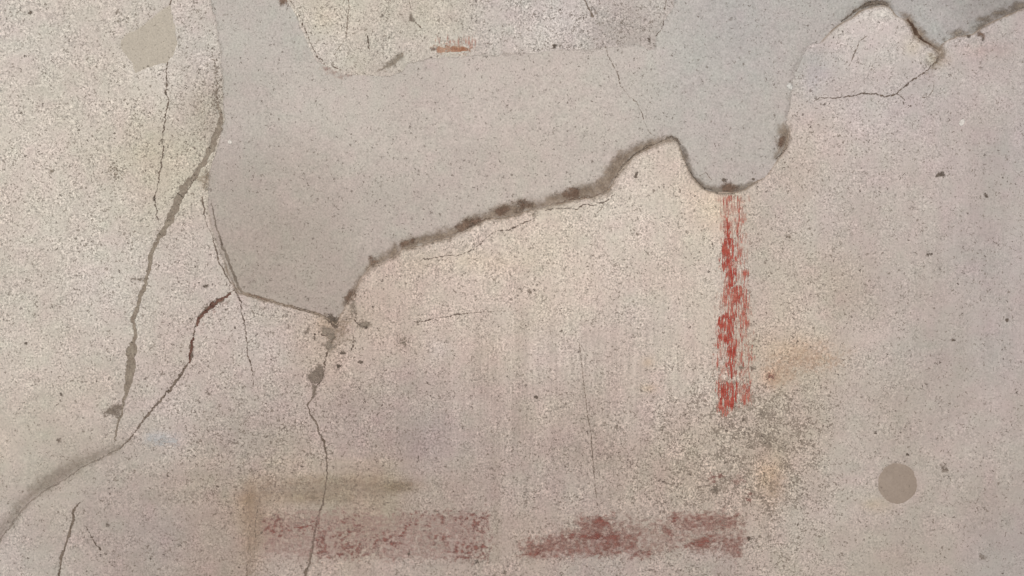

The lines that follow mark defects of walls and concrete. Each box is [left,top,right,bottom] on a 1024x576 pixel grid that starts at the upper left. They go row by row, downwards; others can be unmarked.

spalling [841,0,889,22]
spalling [903,15,944,58]
spalling [952,3,1024,41]
crack [814,57,939,101]
spalling [366,136,755,270]
crack [104,62,254,449]
spalling [212,206,370,397]
crack [304,356,328,576]
crack [57,502,101,576]